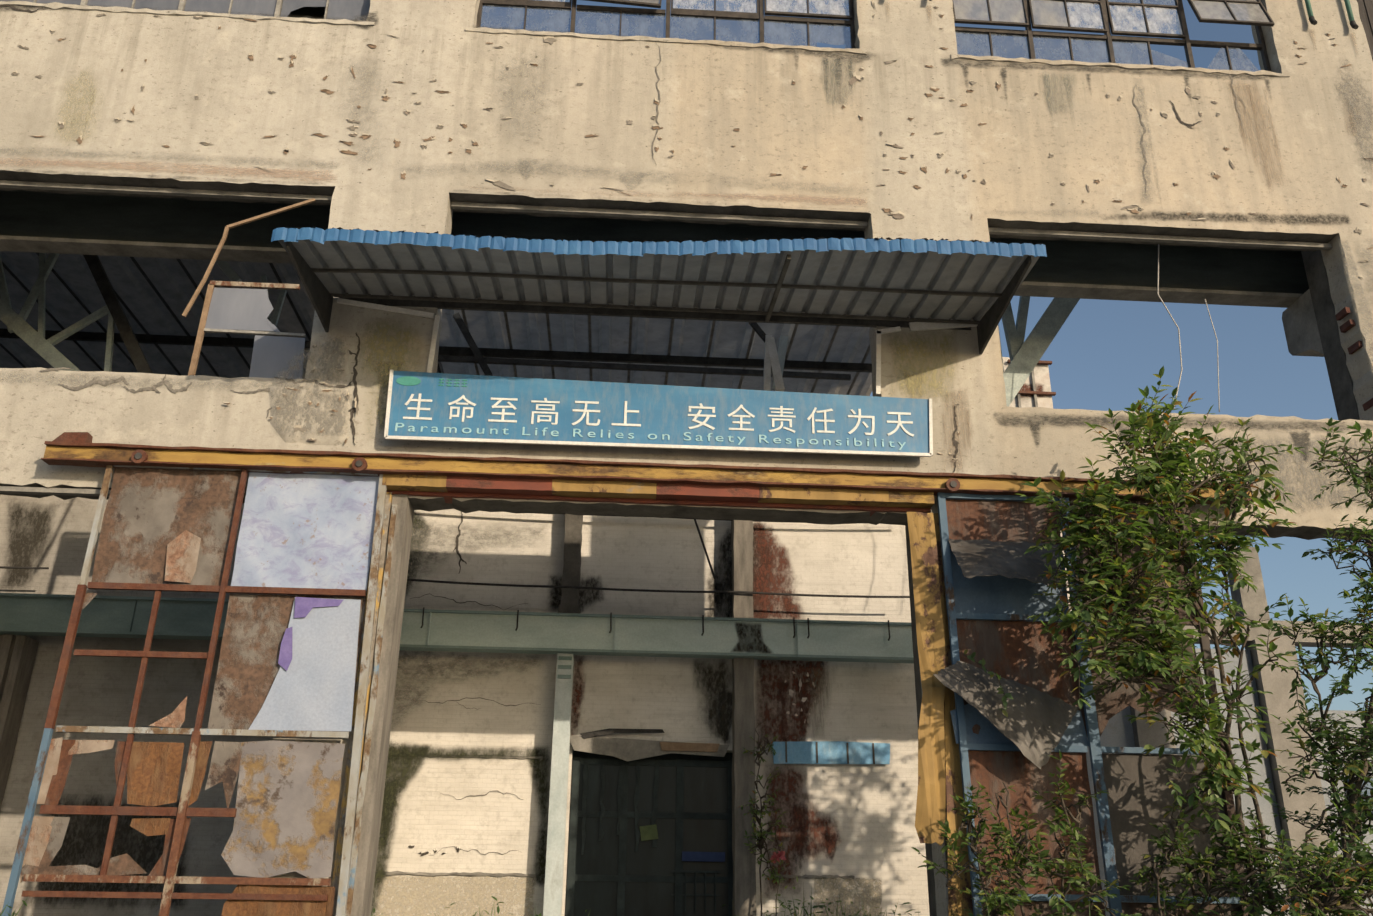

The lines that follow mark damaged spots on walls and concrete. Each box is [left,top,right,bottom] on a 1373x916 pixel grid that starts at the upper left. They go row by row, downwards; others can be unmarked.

spalling [311,104,372,155]
spalling [382,79,451,115]
spalling [421,123,479,154]
crack [652,41,661,163]
crack [1133,87,1201,196]
crack [230,333,360,445]
crack [410,512,528,610]
mould [708,533,732,618]
corrosion [733,523,824,745]
mould [695,661,732,742]
mould [371,743,549,915]
corrosion [766,767,838,896]